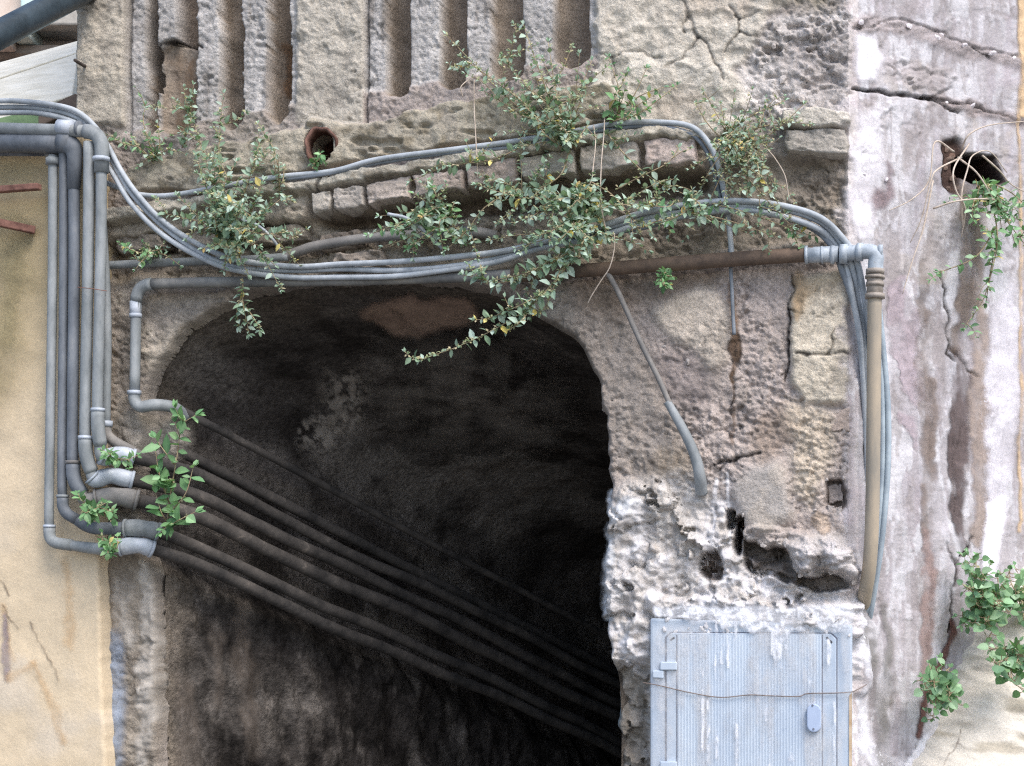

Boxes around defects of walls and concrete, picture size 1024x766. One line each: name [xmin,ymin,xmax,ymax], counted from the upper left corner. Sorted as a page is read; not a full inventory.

crack [851,88,981,113]
crack [783,281,846,380]
water stain [917,293,931,323]
crack [939,277,972,374]
water stain [920,203,989,695]
spalling [812,476,847,535]
water stain [604,533,615,620]
spalling [701,551,725,580]
spalling [725,507,859,592]